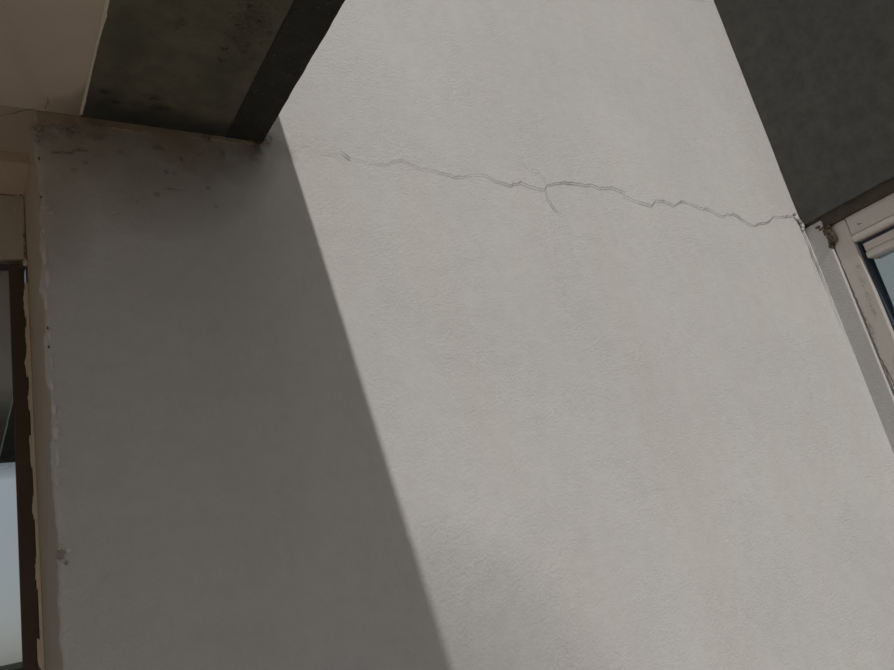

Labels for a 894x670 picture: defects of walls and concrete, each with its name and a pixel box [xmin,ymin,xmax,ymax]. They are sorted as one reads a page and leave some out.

leakage [67,103,225,163]
crack [509,181,825,283]